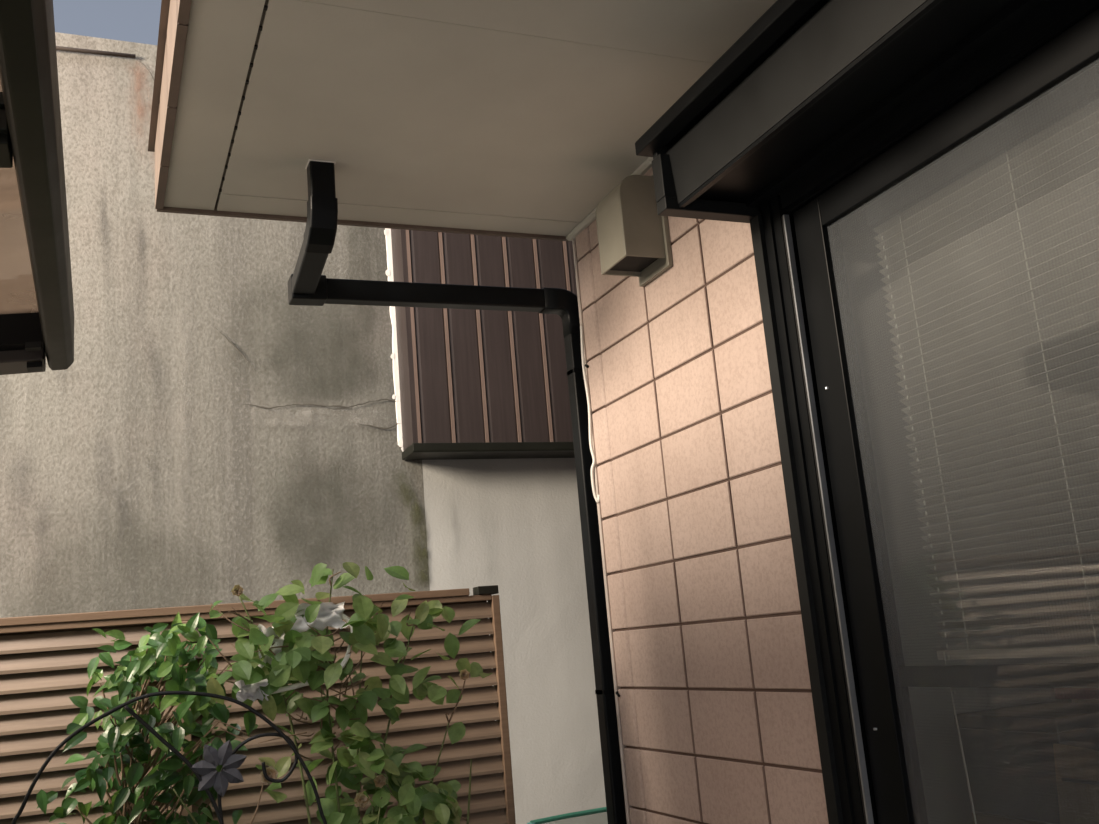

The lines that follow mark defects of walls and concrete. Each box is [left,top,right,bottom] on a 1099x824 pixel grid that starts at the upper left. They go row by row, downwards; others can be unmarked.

crack [214,327,402,430]